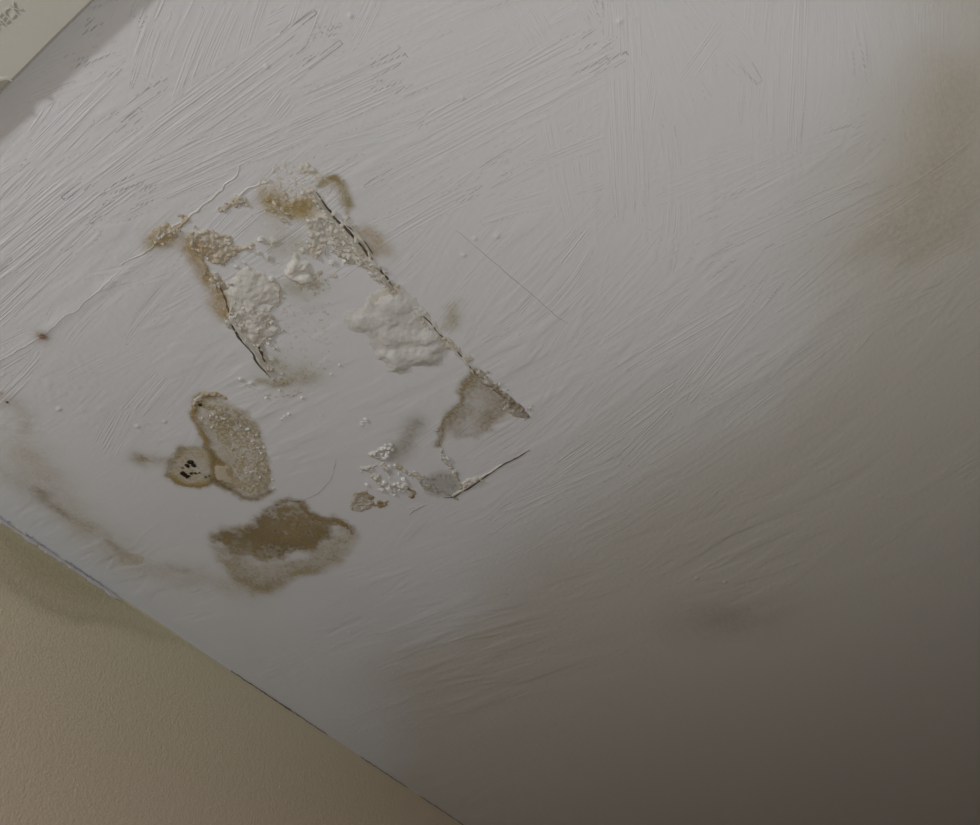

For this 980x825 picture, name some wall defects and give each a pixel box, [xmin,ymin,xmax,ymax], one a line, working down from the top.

flaking render [121,161,343,399]
water stain [165,447,225,488]
flaking render [190,391,274,500]
peeling [350,428,530,514]
water stain [438,369,533,446]
water stain [215,500,354,591]